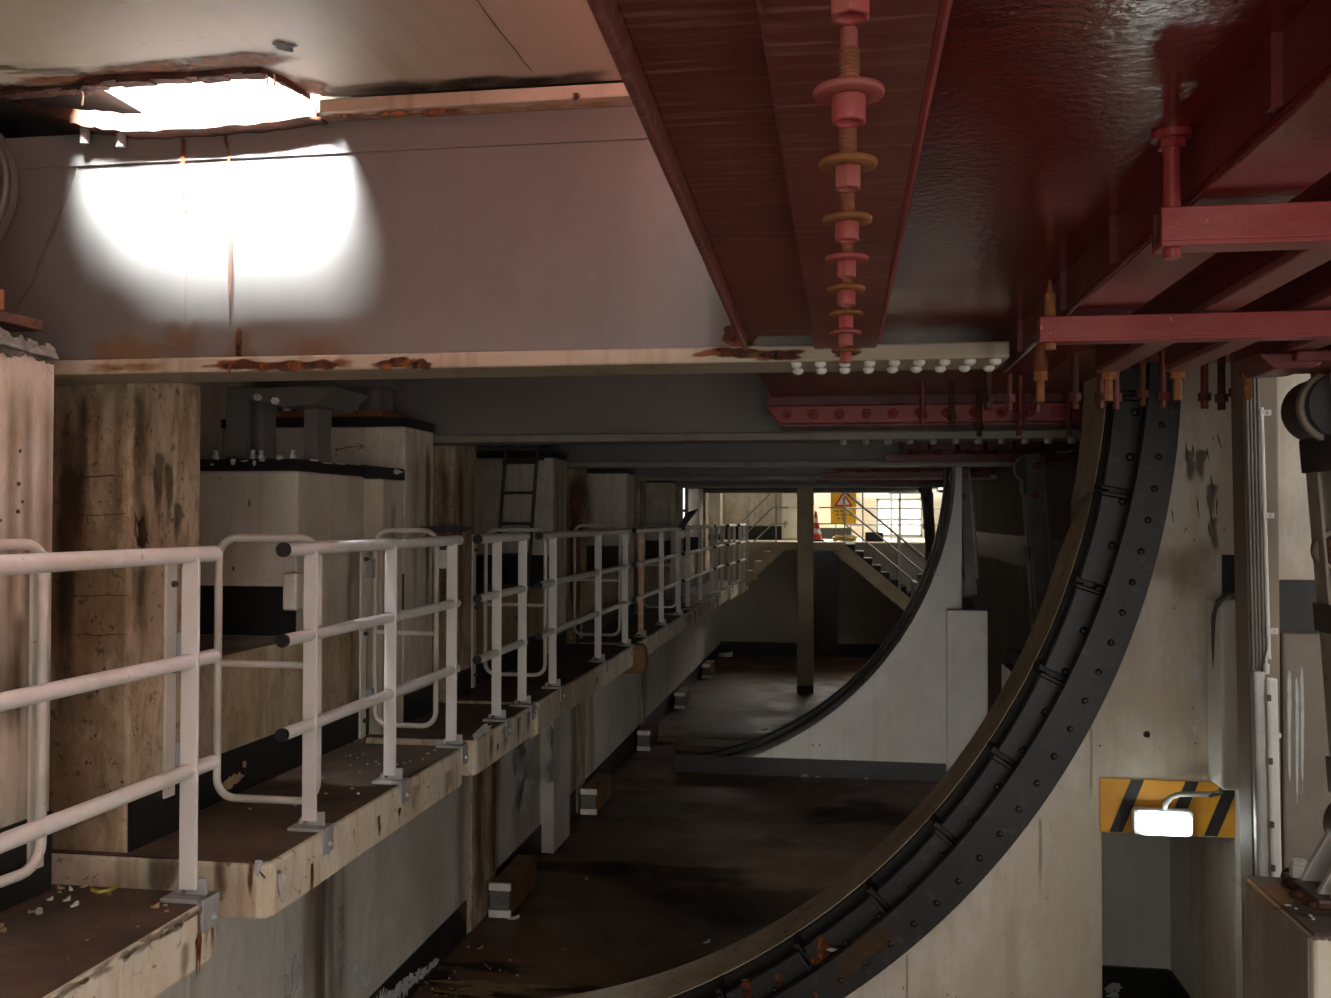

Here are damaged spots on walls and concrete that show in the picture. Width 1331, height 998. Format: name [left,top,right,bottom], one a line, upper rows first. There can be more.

corrosion [0,53,326,106]
corrosion [203,135,351,373]
corrosion [372,357,432,370]
corrosion [693,325,804,361]